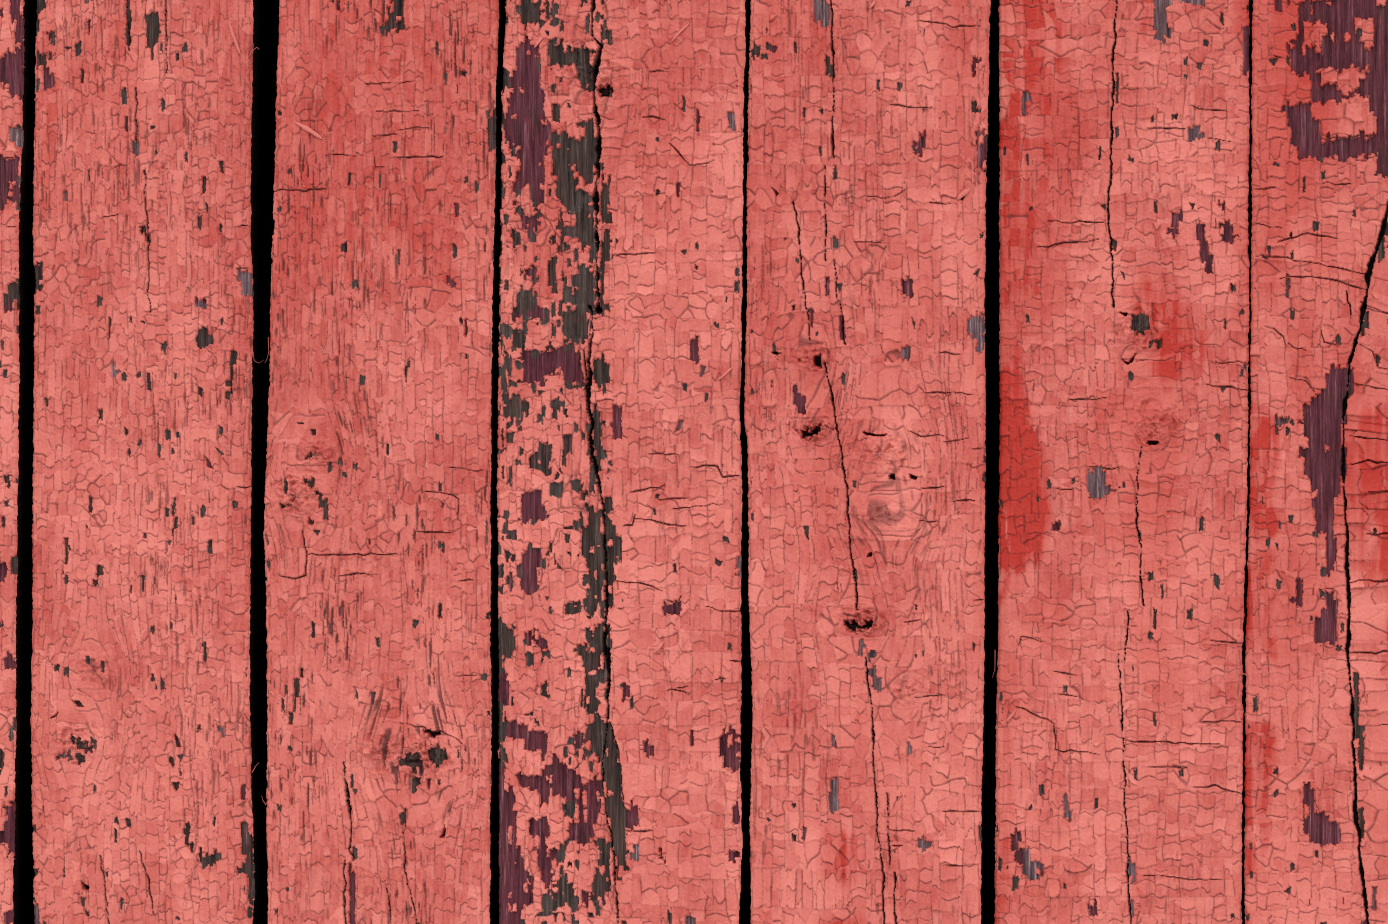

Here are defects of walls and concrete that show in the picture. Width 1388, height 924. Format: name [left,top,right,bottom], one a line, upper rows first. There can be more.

peeling [0,0,56,100]
crack [1037,3,1118,308]
peeling [1136,0,1205,44]
peeling [1275,0,1388,178]
crack [279,467,483,580]
peeling [477,0,654,924]
crack [584,1,741,923]
crack [794,92,882,610]
crack [1015,453,1243,923]
crack [1218,181,1388,924]
peeling [1275,364,1383,654]
peeling [1299,782,1365,853]